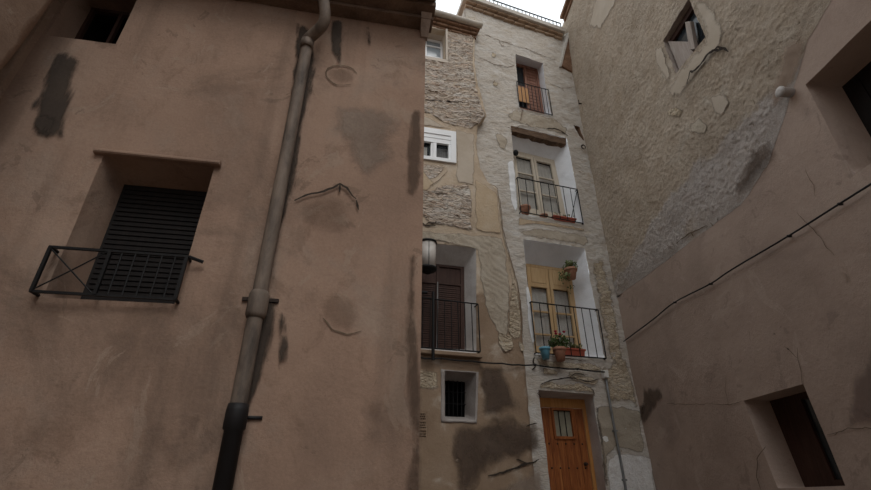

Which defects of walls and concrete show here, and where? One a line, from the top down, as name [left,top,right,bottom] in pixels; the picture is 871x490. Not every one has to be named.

water stain [32,53,77,137]
water stain [291,26,308,95]
water stain [332,20,342,61]
water stain [280,51,315,225]
water stain [408,111,420,193]
crack [294,183,359,210]
spalling [423,164,472,229]
water stain [408,290,420,426]